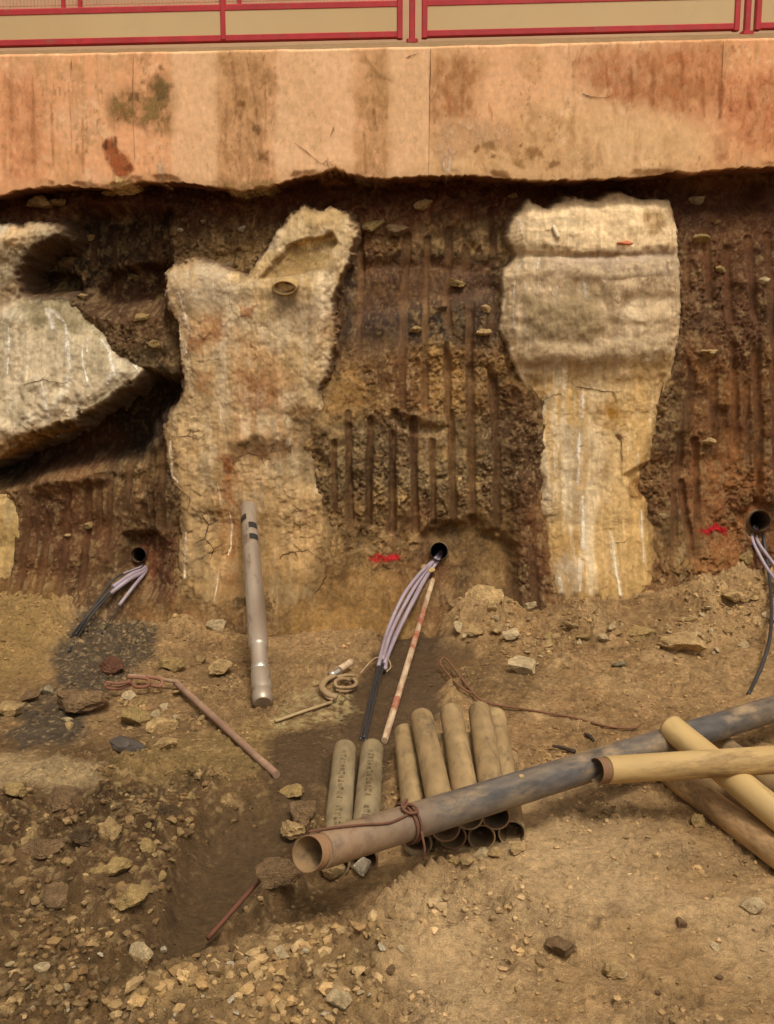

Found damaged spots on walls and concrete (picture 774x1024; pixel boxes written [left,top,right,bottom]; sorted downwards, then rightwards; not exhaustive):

corrosion [590,50,774,143]
crack [169,469,223,560]